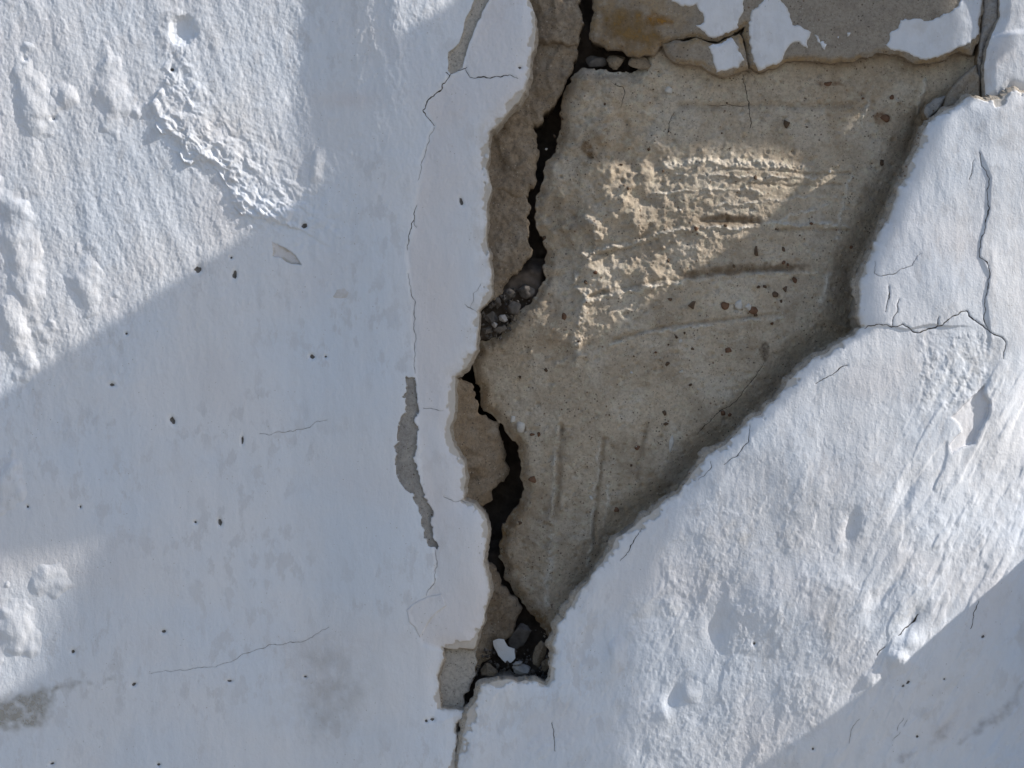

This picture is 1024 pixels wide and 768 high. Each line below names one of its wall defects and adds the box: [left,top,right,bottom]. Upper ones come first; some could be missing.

peeling [394,376,438,549]
crack [418,67,516,180]
crack [443,378,549,703]
crack [466,0,638,341]
spalling [438,0,1024,768]
crack [866,152,1006,359]